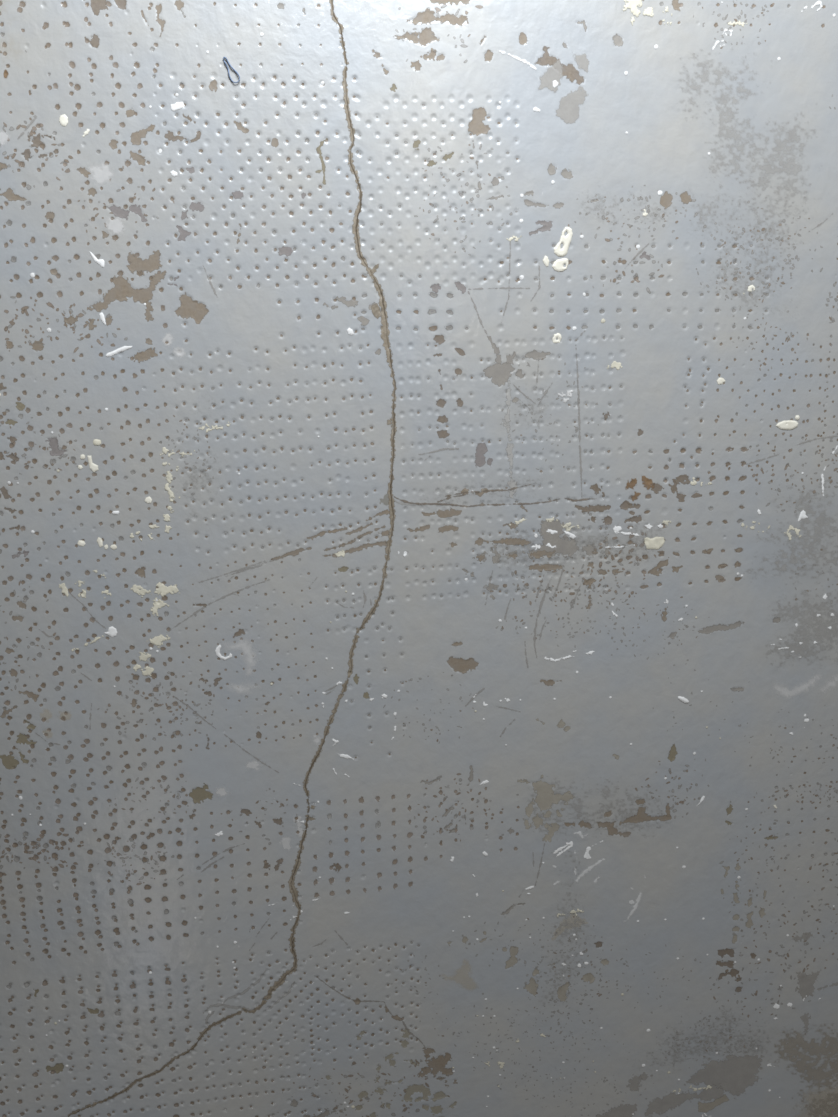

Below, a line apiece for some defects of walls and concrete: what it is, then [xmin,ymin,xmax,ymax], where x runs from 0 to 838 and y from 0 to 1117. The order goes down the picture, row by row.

crack [68,0,589,1116]
peeling [0,0,709,964]
peeling [0,709,838,1117]
peeling [456,57,838,659]